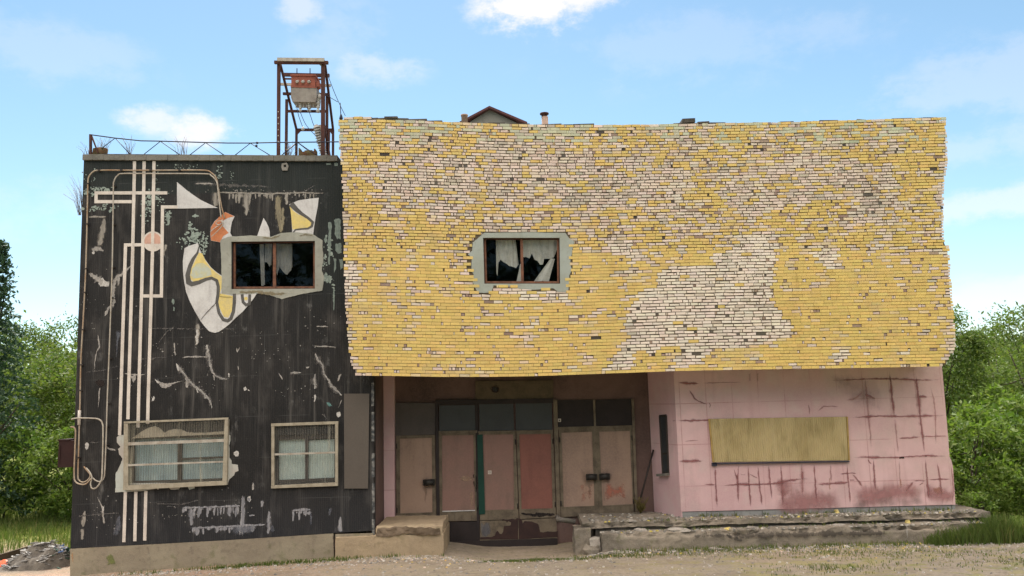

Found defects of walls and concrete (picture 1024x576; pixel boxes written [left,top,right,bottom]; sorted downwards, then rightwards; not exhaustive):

water stain [196,183,319,239]
crack [706,378,954,504]
water stain [861,487,915,502]
water stain [929,479,951,500]
peeling [480,518,558,539]